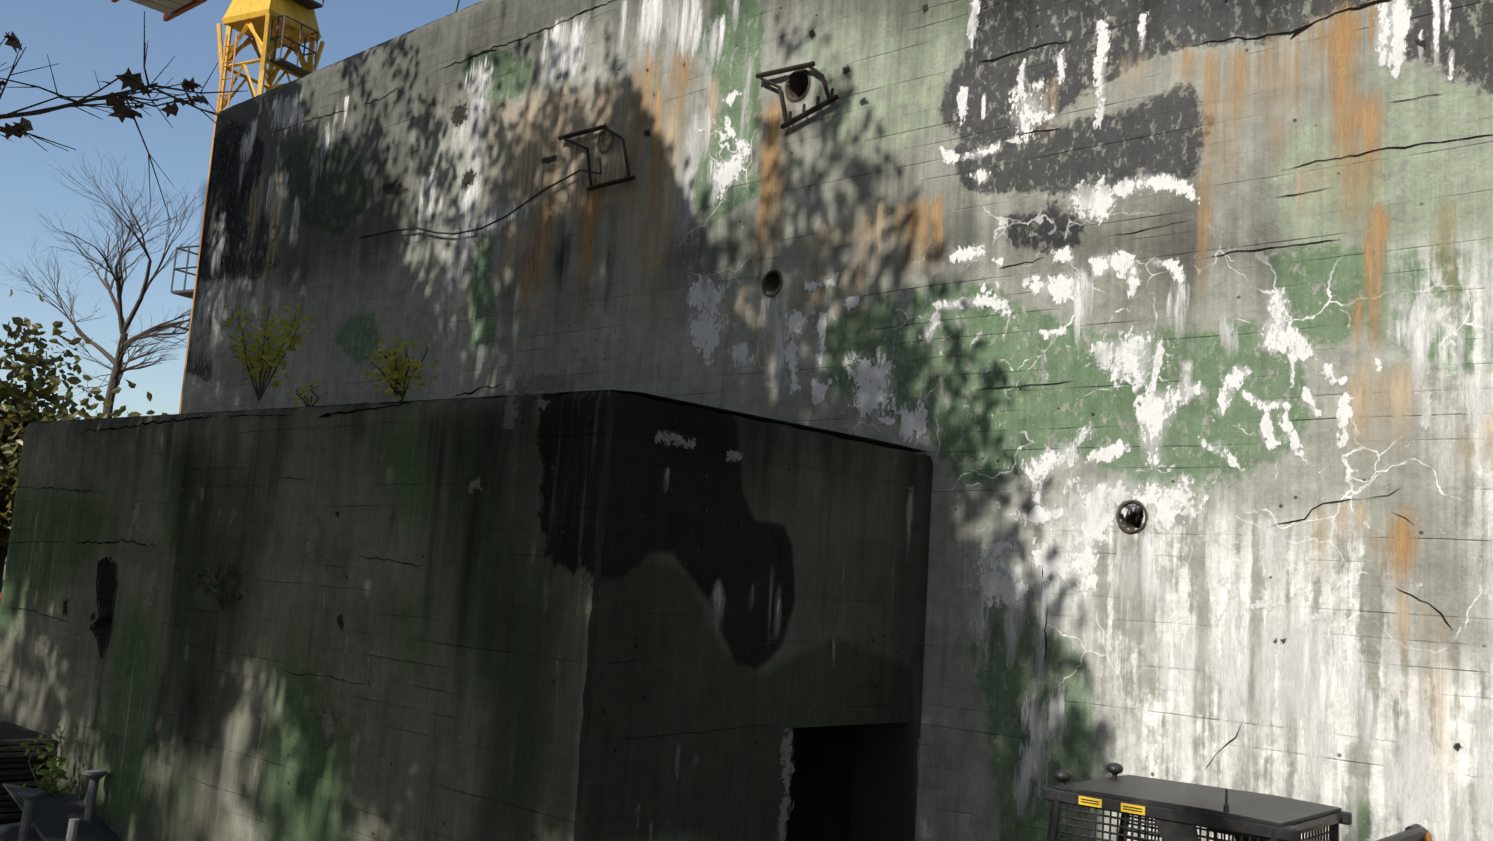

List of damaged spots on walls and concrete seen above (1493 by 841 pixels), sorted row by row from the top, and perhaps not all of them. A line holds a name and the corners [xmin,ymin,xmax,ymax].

crack [1177,0,1390,50]
rust [1334,5,1378,160]
rust [490,52,684,276]
damp [1074,271,1094,333]
damp [1167,284,1185,325]
rust [1356,205,1386,325]
damp [1258,515,1274,572]
spalling [89,555,119,660]
spalling [774,728,795,841]